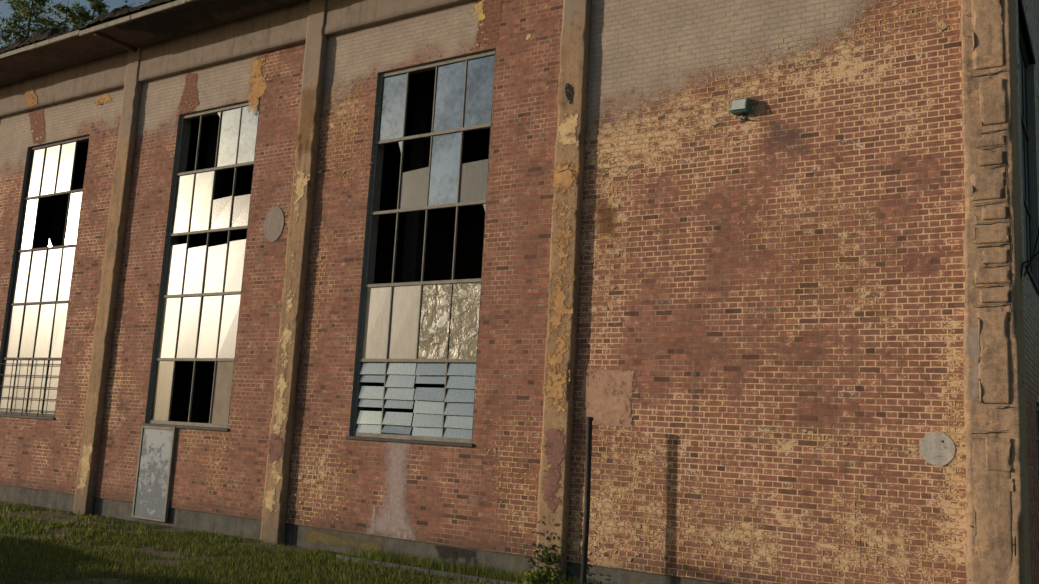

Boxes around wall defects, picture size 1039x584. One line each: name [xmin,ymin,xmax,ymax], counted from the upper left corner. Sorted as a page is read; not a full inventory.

peeling [264,222,358,526]
peeling [290,73,377,222]
water stain [306,438,414,553]
peeling [474,0,980,584]